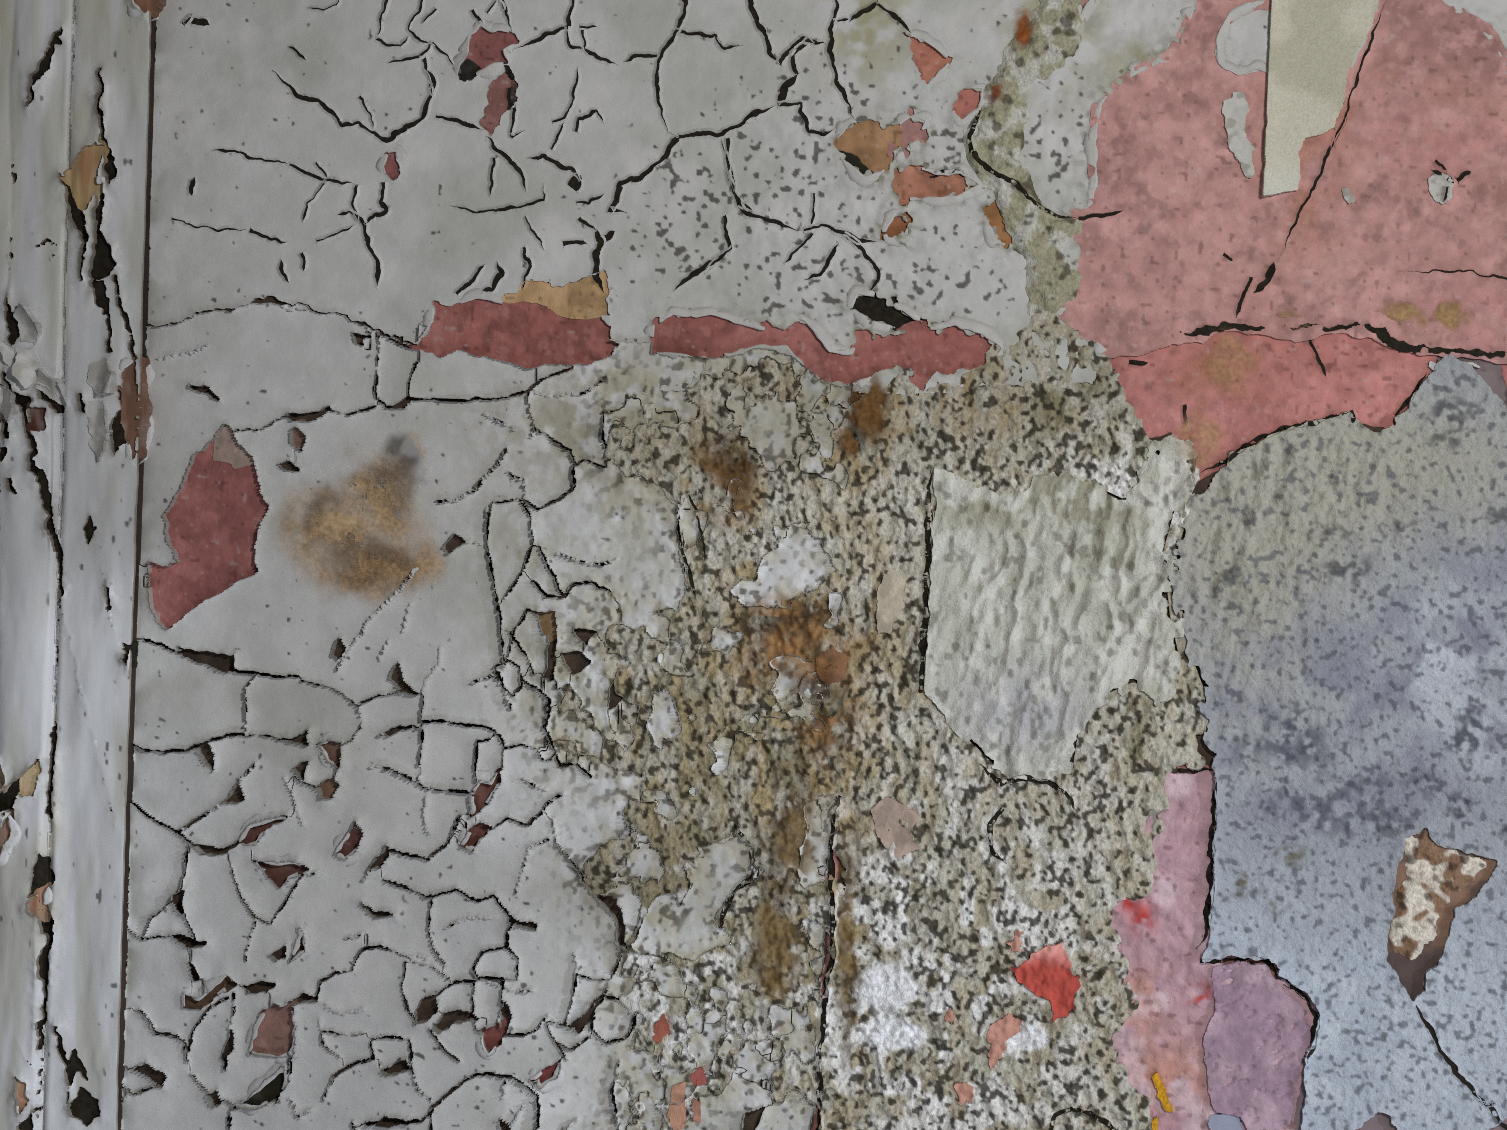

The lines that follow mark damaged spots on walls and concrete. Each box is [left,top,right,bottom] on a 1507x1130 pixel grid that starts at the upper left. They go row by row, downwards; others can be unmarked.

crack [171,146,392,289]
crack [271,0,912,296]
crack [929,91,1124,224]
peeling [1058,0,1507,481]
crack [1180,0,1507,478]
leakage [284,465,440,595]
peeling [87,270,1006,1130]
crack [914,467,936,693]
crack [811,799,843,1130]
peeling [1007,930,1081,1022]
peeling [1111,770,1316,1130]
peeling [1386,828,1497,1000]